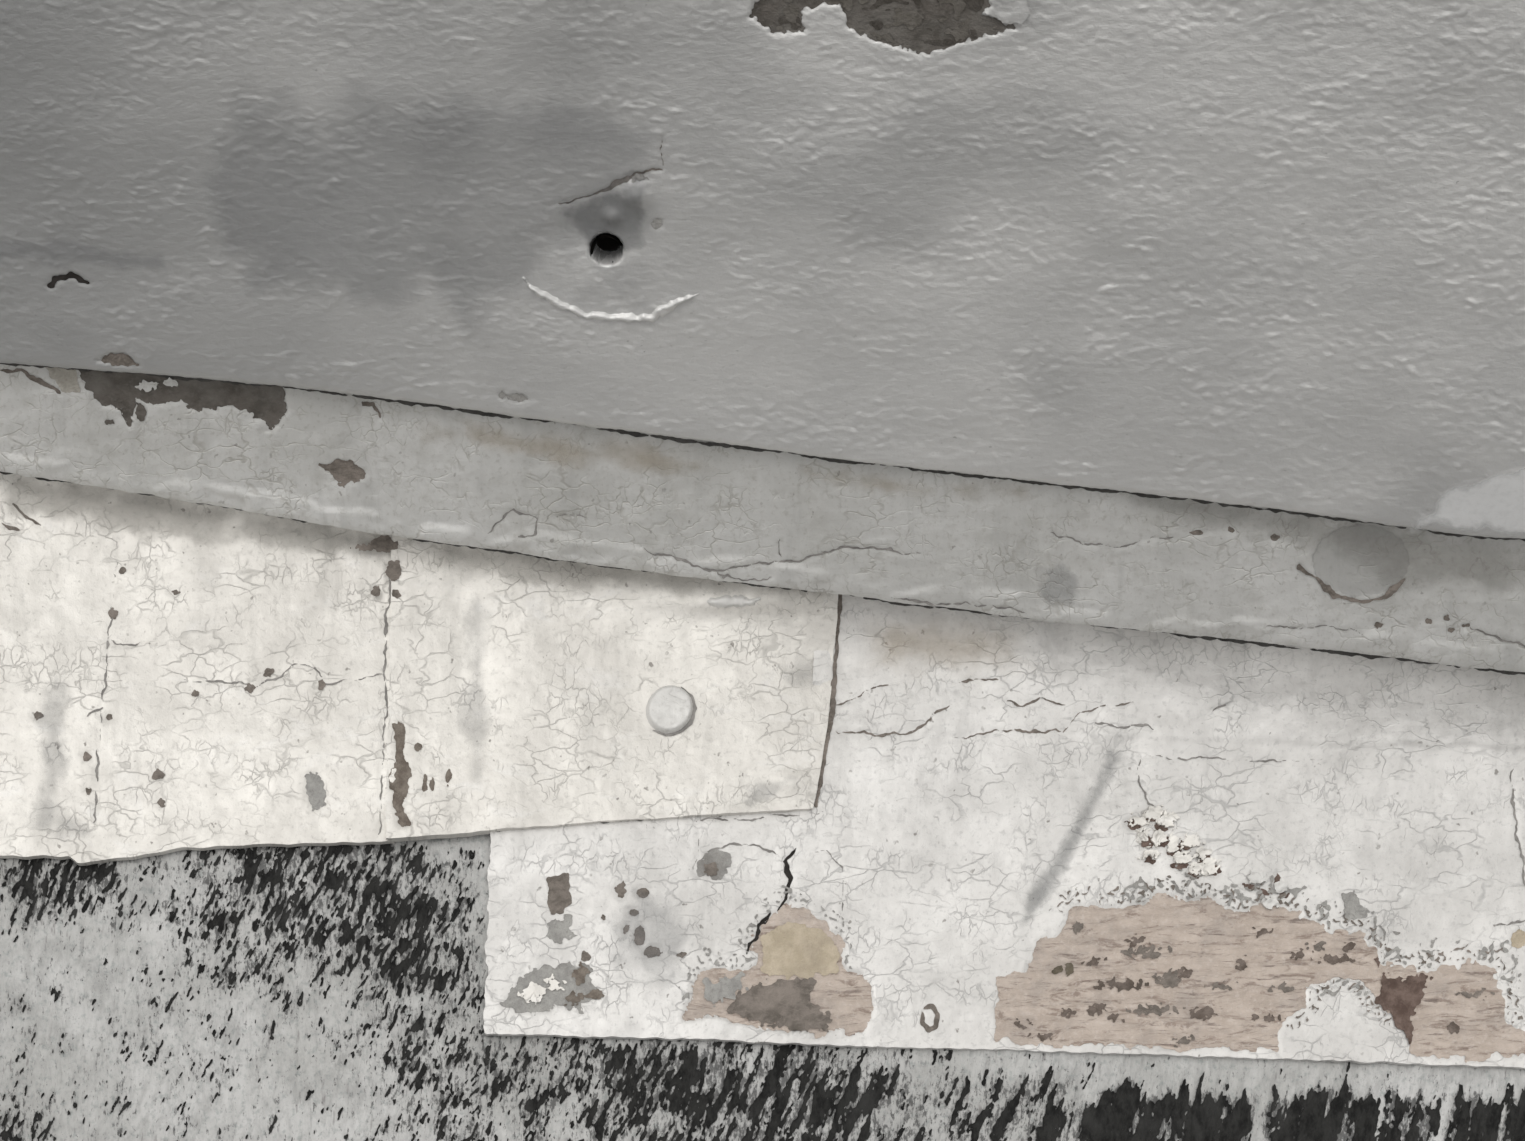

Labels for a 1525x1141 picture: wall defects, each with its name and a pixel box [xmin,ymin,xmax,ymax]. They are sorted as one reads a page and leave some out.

peeling [749,0,1032,54]
crack [0,368,61,394]
peeling [45,353,287,430]
crack [2,503,41,531]
peeling [388,721,452,827]
peeling [500,873,604,1014]
peeling [614,881,874,1039]
crack [695,811,844,954]
peeling [994,804,1525,1063]